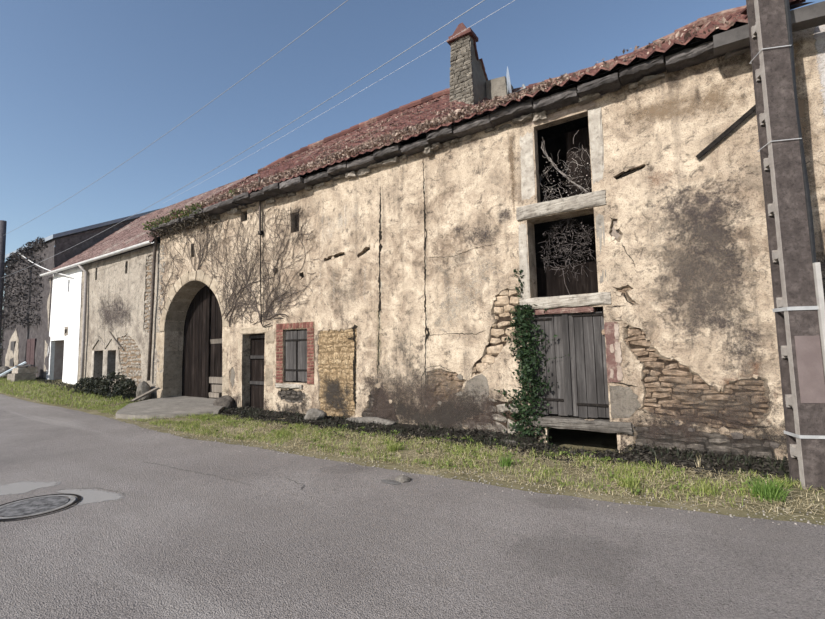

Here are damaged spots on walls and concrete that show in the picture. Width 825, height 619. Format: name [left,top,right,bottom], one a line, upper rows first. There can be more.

crack [347,193,384,409]
crack [421,163,495,402]
spalling [424,288,519,408]
spalling [602,323,780,460]
damp [653,180,761,371]